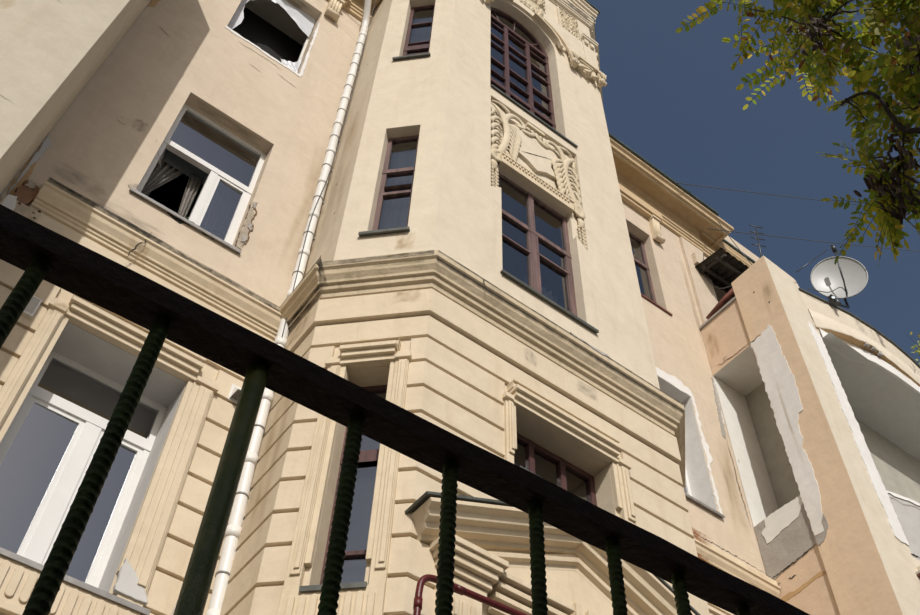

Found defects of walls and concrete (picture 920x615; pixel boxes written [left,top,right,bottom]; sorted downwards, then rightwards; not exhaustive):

spalling [7,146,41,219]
crack [124,219,151,257]
spalling [235,202,257,250]
spalling [754,504,828,580]